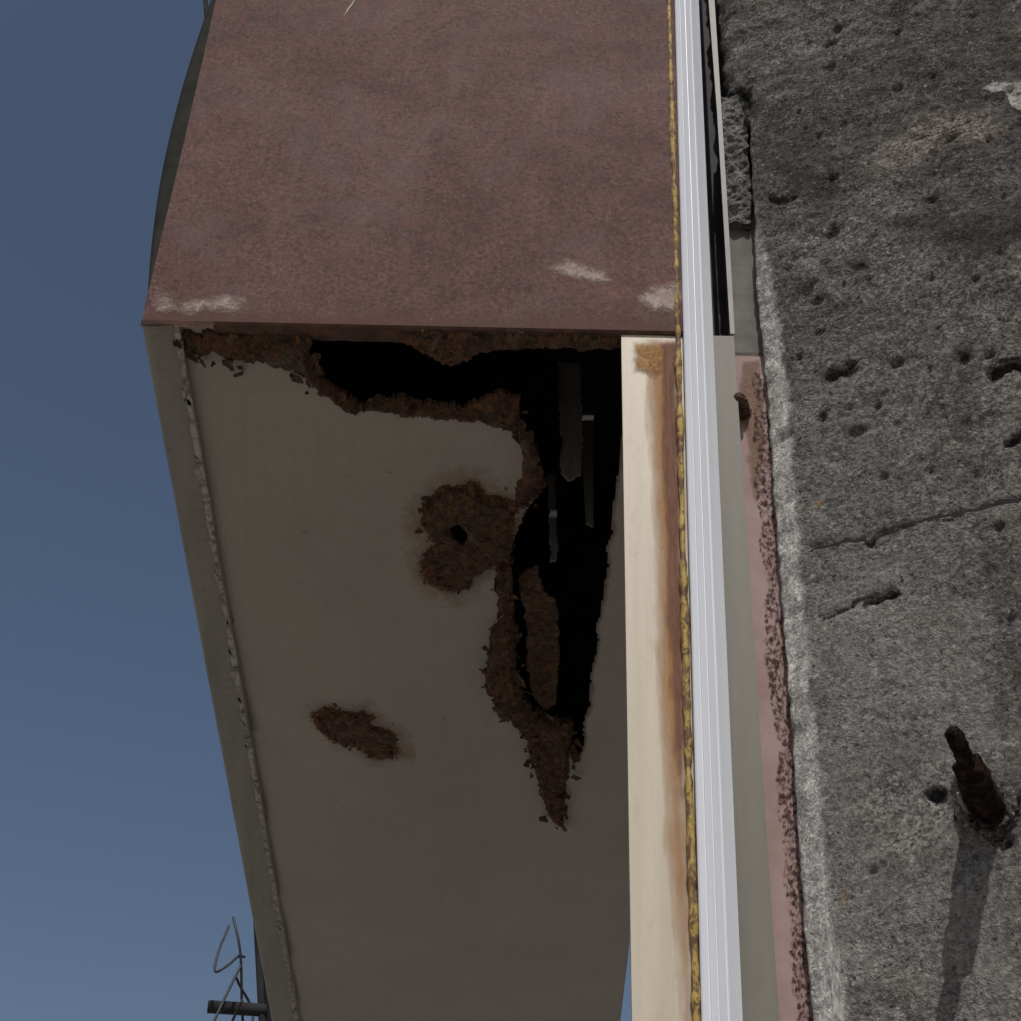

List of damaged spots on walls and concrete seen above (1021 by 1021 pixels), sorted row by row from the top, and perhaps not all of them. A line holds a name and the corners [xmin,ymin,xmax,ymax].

corrosion [173,328,582,832]
corrosion [399,329,619,366]
corrosion [635,342,684,894]
corrosion [741,362,813,1021]
crack [823,590,903,620]
crack [811,498,1021,551]